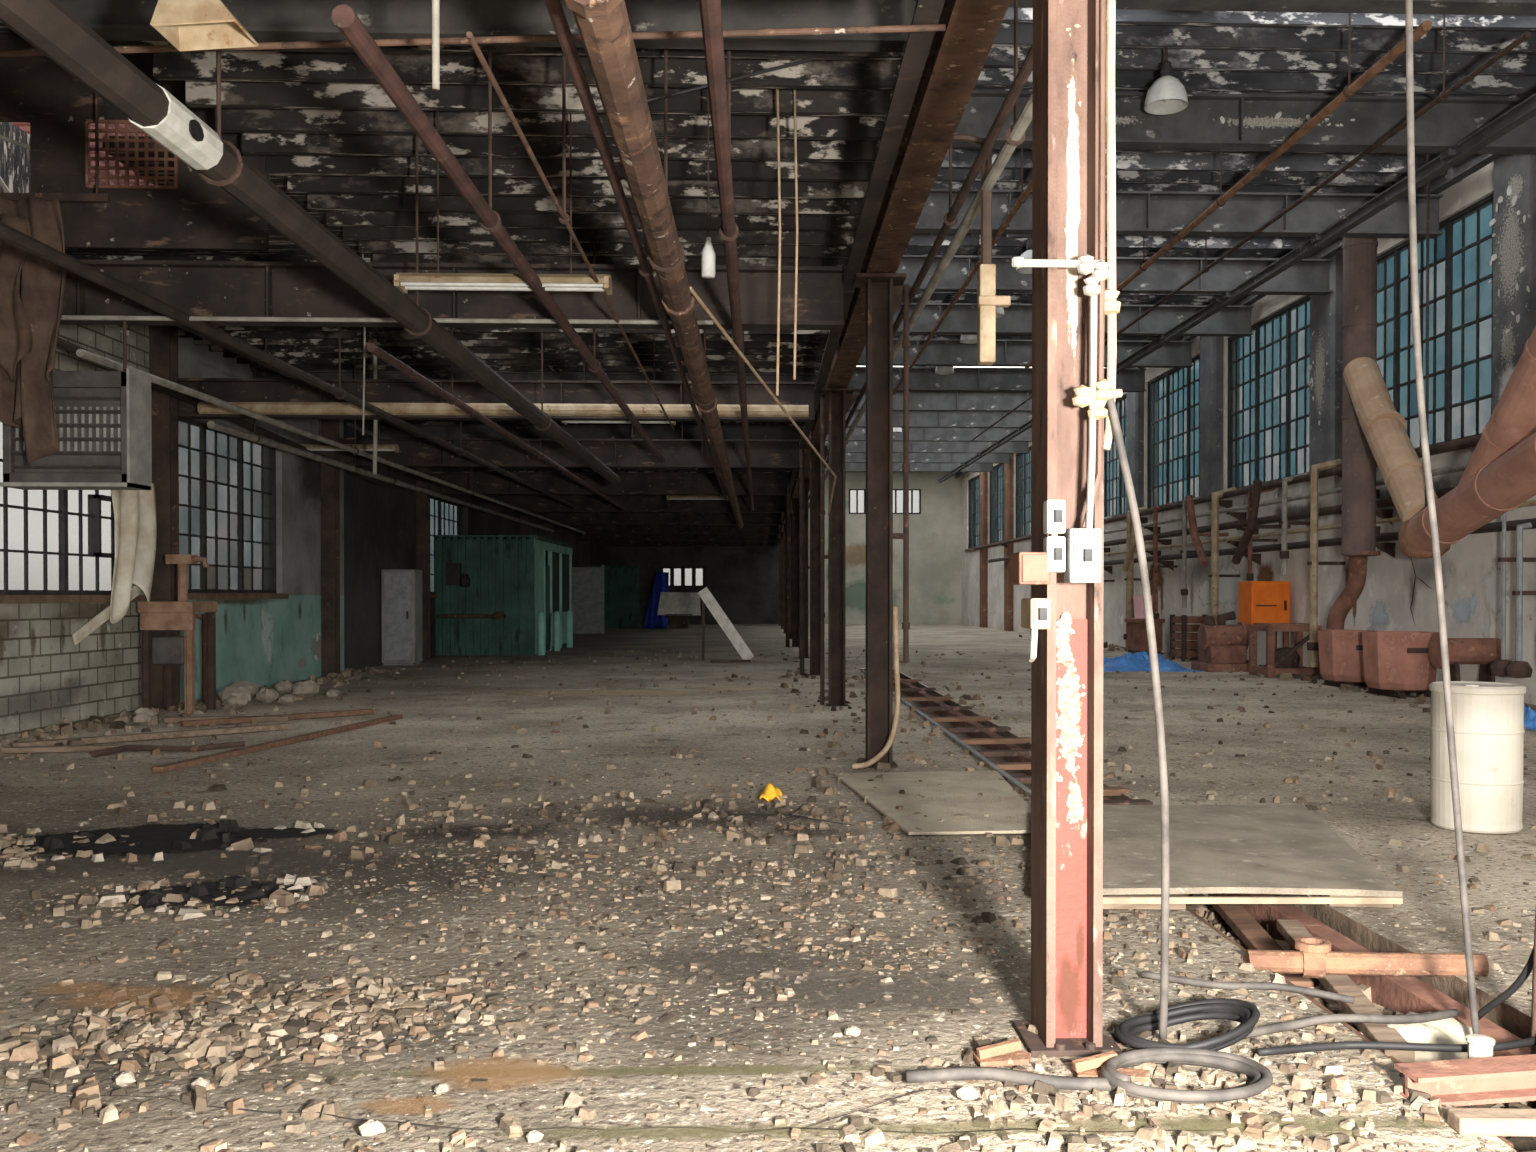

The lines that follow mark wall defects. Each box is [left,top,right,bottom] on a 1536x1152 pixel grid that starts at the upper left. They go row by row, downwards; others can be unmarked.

peeling [1106,115,1145,127]
peeling [1213,112,1355,130]
leakage [61,604,107,648]
peeling [1056,613,1085,829]
rust [1059,929,1083,1027]